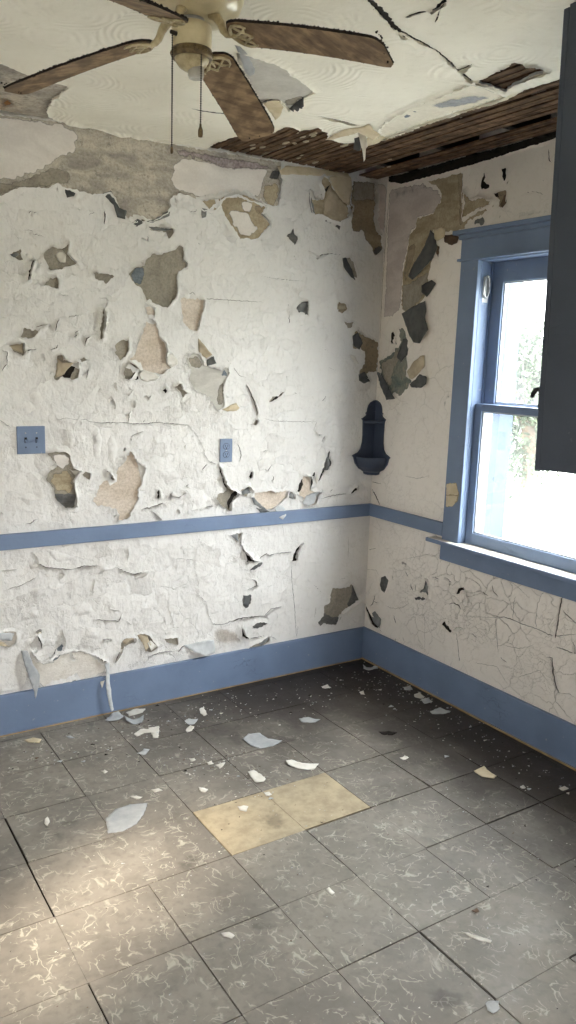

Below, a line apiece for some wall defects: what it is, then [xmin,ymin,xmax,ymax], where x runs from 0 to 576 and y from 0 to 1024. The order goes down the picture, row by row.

crack [361,0,477,99]
crack [316,116,396,134]
peeling [0,59,560,415]
peeling [41,443,190,525]
peeling [211,448,334,519]
spalling [446,483,459,507]
peeling [225,528,266,576]
peeling [287,539,304,566]
peeling [236,590,273,649]
peeling [316,579,382,632]
crack [341,541,576,695]
peeling [0,624,215,691]